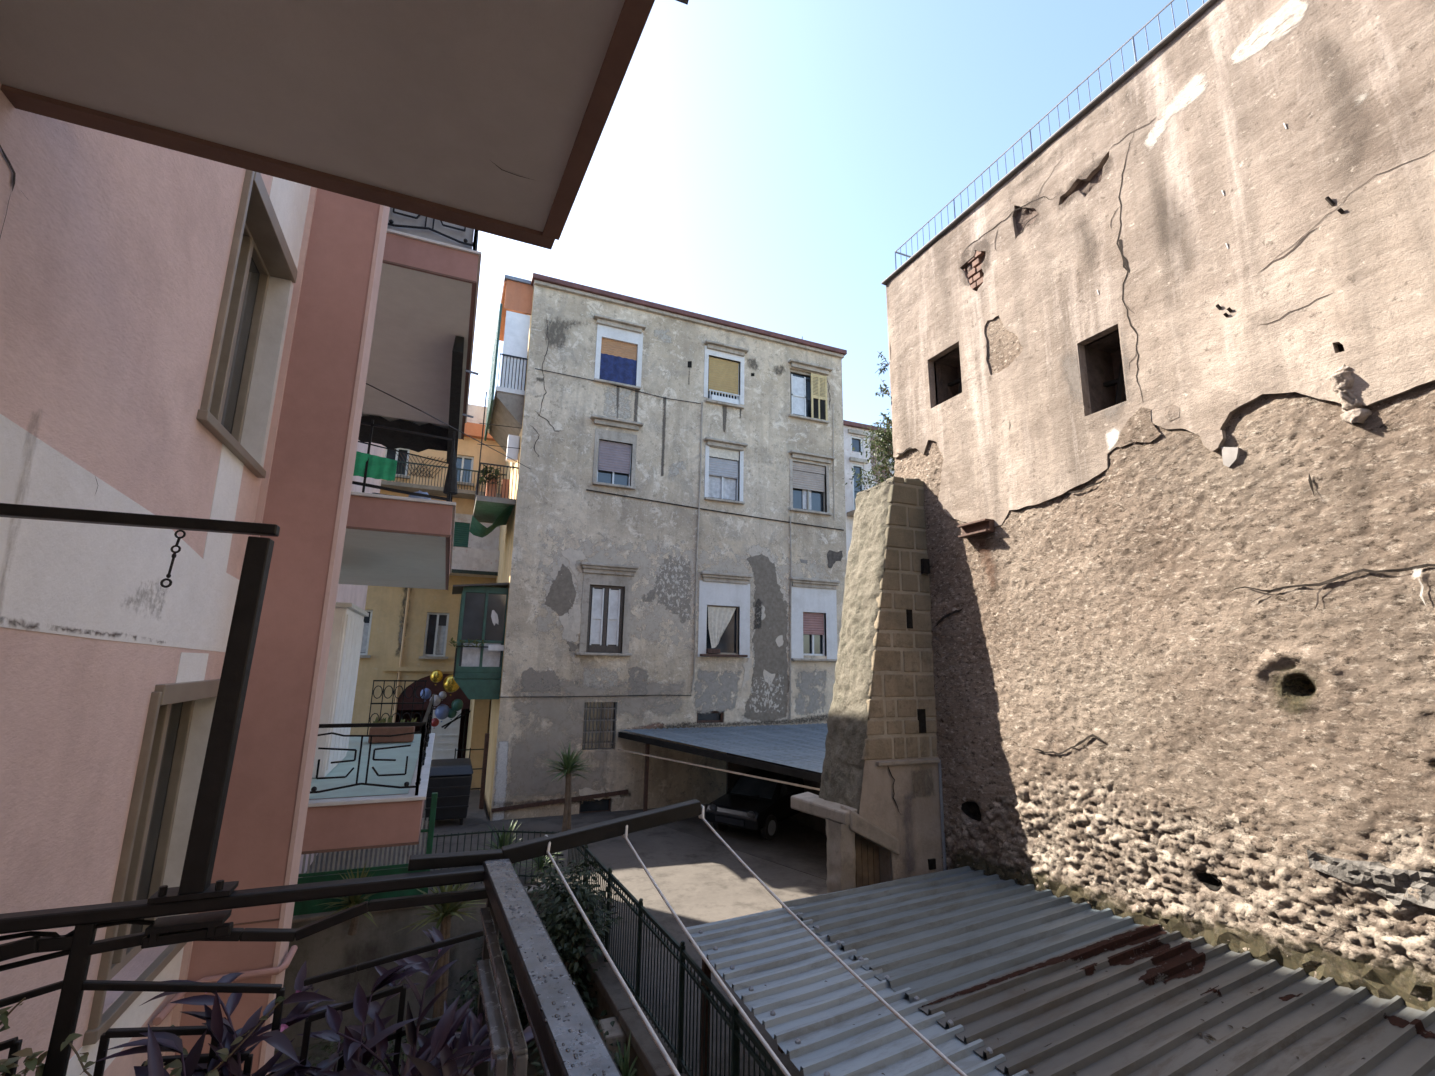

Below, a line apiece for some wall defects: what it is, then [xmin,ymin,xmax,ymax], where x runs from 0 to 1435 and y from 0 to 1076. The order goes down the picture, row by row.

flaking render [1063,168,1103,203]
crack [1258,150,1434,273]
flaking render [964,251,986,291]
crack [1110,117,1156,401]
flaking render [985,316,1023,374]
flaking render [1117,404,1180,447]
crack [1230,564,1435,609]
flaking render [535,529,843,726]
flaking render [1307,850,1435,909]
rust [921,924,1206,1007]
rust [1383,1015,1435,1038]